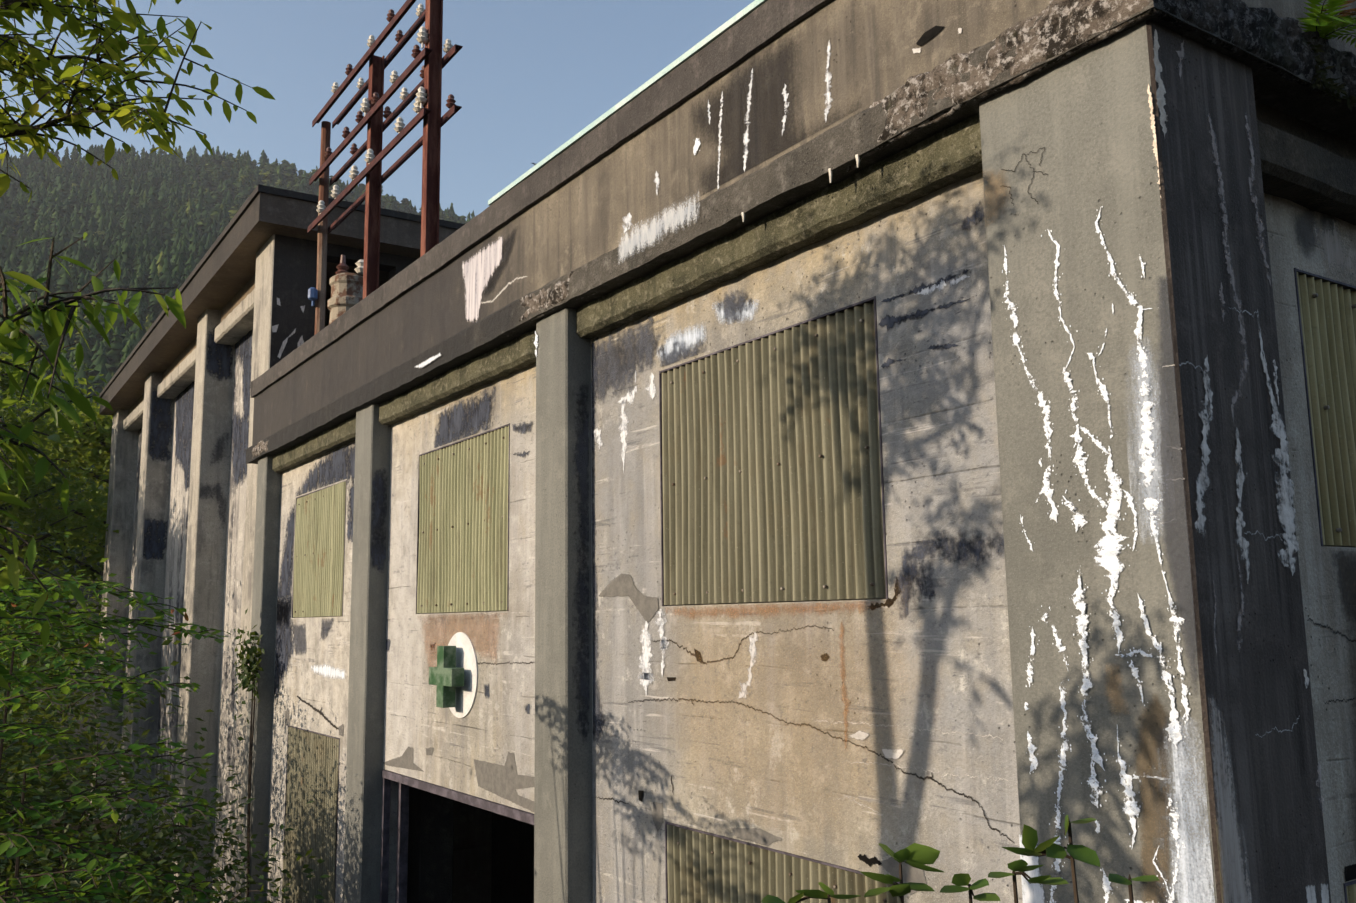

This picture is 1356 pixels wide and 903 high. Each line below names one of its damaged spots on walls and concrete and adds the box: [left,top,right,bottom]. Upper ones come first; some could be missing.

leakage [824,42,837,127]
spalling [845,0,1356,197]
leakage [619,43,806,258]
crack [1000,147,1048,206]
leakage [462,231,515,321]
leakage [879,269,971,330]
leakage [1209,116,1299,649]
leakage [898,532,1004,617]
leakage [1002,206,1252,903]
crack [653,625,834,665]
crack [1307,618,1356,642]
crack [630,698,1014,843]